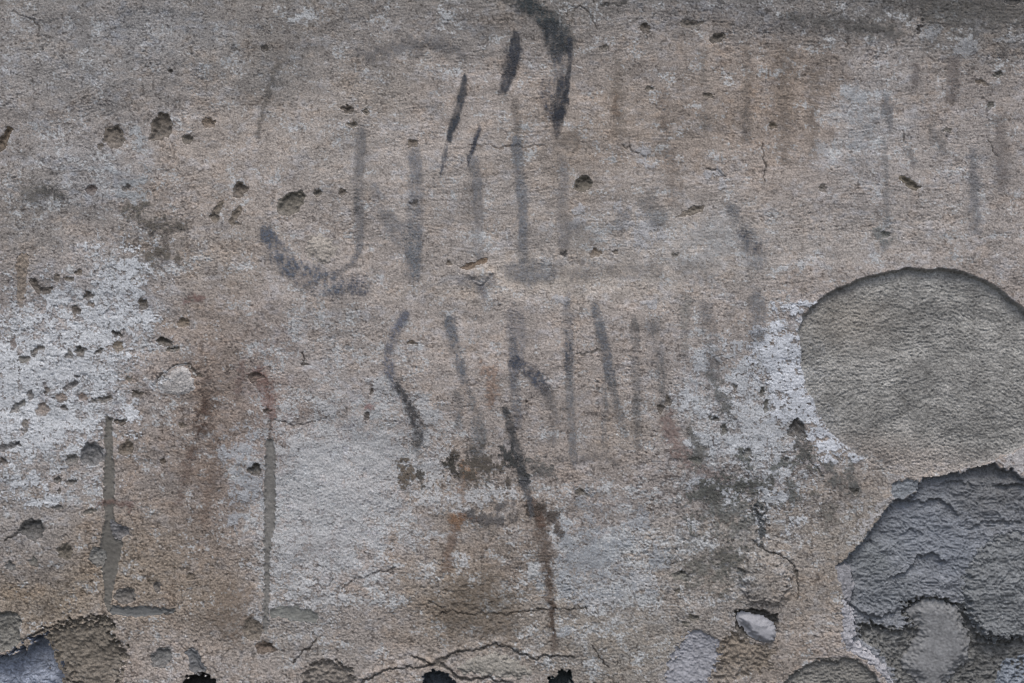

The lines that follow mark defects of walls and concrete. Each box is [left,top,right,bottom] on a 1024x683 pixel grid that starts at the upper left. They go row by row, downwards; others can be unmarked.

spalling [784,449,1024,683]
spalling [0,611,131,683]
crack [352,642,568,683]
spalling [707,608,779,683]